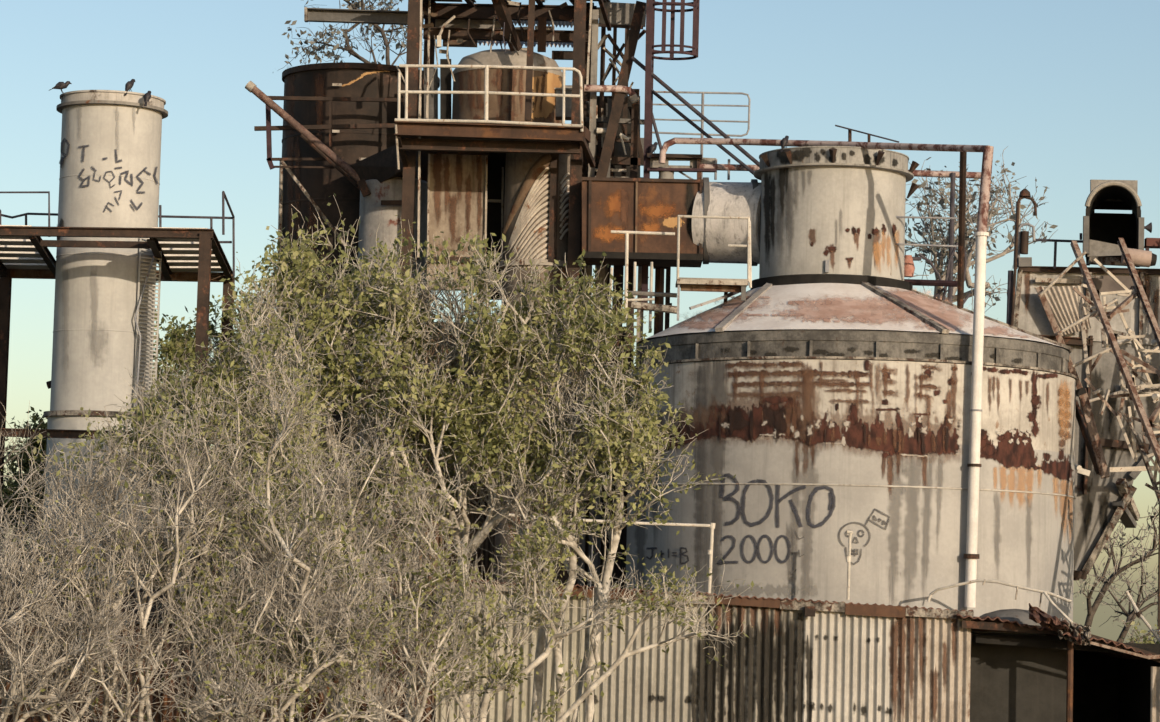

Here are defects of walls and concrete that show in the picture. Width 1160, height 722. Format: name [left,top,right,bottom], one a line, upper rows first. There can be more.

corrosion [285,74,316,271]
corrosion [582,181,703,268]
leakage [763,144,898,255]
corrosion [809,224,899,268]
corrosion [680,289,970,331]
corrosion [727,359,958,490]
corrosion [983,366,1071,447]
leakage [685,604,838,722]
corrosion [889,616,957,722]